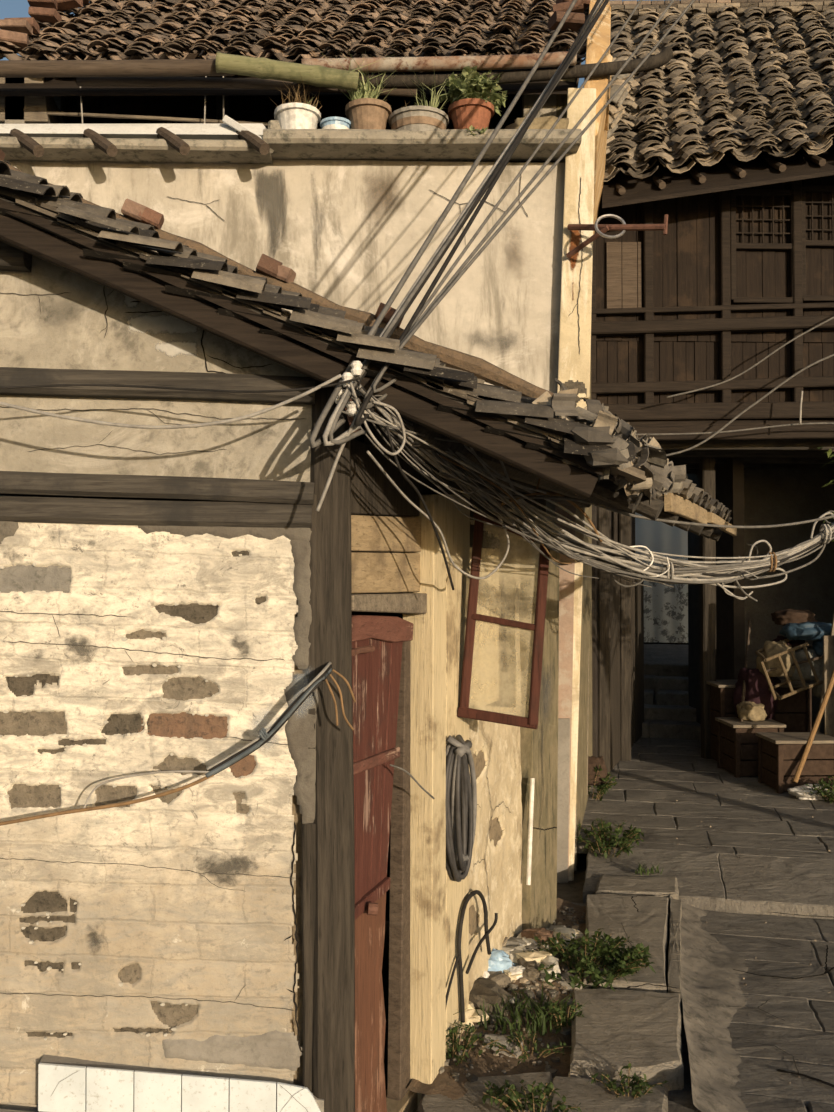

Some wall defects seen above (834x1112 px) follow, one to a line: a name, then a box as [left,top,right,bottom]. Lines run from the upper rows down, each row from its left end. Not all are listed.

water stain [256,172,285,256]
corrosion [569,230,581,270]
crack [1,292,69,313]
crack [101,286,162,338]
crack [201,330,271,373]
crack [0,406,305,455]
spalling [0,562,71,593]
spalling [147,602,219,624]
spalling [0,663,228,754]
spalling [4,784,63,809]
spalling [95,753,206,808]
crack [728,945,834,1087]